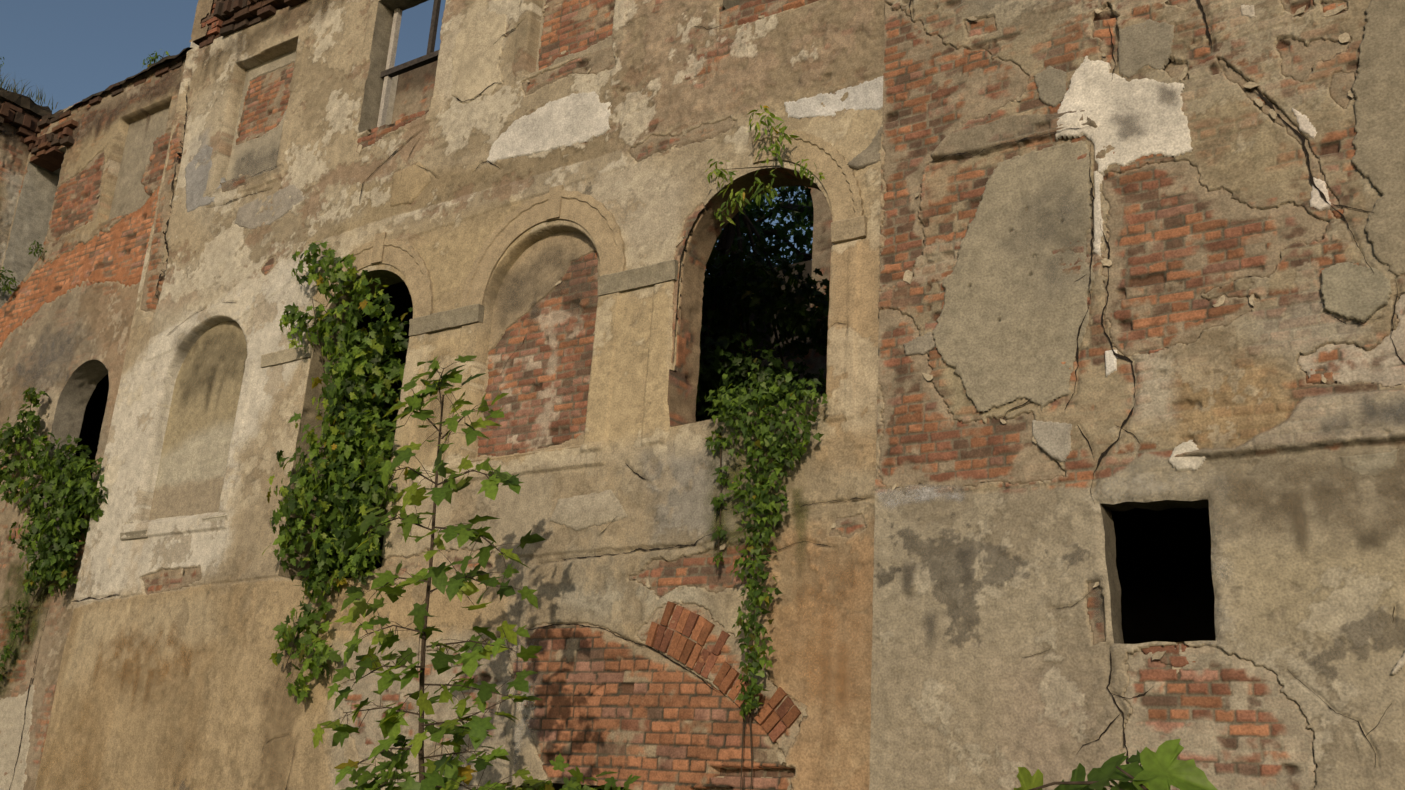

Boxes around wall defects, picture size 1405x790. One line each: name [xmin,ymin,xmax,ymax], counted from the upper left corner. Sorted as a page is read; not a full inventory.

flaking render [0,122,184,349]
flaking render [478,251,599,457]
flaking render [522,0,616,96]
flaking render [880,3,1029,292]
flaking render [878,309,1066,496]
crack [928,126,1140,504]
crack [1196,0,1405,364]
flaking render [1297,294,1405,388]
flaking render [333,540,808,790]
crack [1078,652,1154,782]
flaking render [1122,643,1317,790]
crack [1287,669,1392,765]